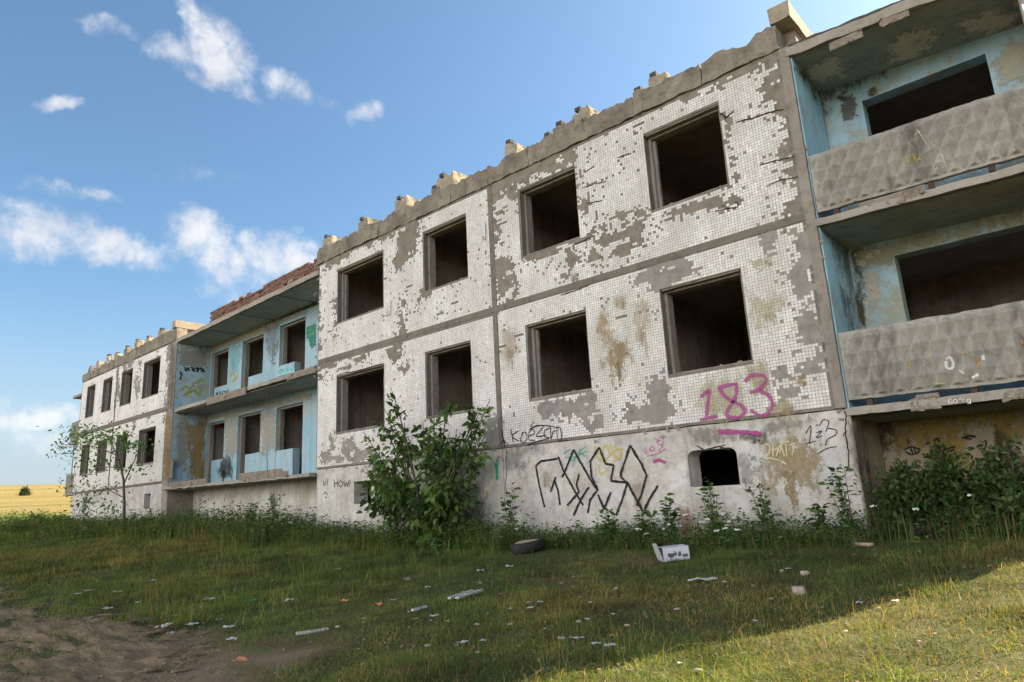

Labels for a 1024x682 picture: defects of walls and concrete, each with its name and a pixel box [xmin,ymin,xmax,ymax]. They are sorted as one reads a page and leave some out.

crack [720,109,784,123]
peeling [805,28,863,121]
peeling [875,0,1024,87]
peeling [484,114,746,315]
peeling [621,47,829,415]
crack [759,156,798,187]
peeling [210,215,432,386]
peeling [532,367,685,443]
peeling [319,430,377,472]